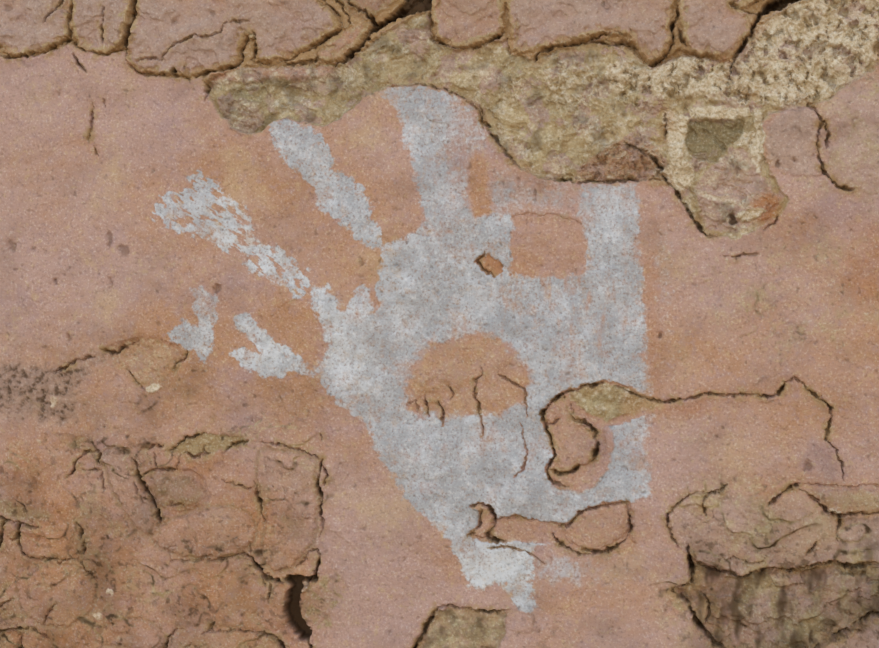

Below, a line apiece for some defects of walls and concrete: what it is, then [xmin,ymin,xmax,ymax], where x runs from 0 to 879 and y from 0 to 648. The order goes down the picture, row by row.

crack [0,0,506,100]
crack [533,6,688,68]
spalling [204,0,879,241]
spalling [109,335,187,393]
crack [0,516,98,582]
crack [66,449,107,494]
crack [132,433,330,602]
spalling [540,379,655,492]
crack [406,368,879,648]
crack [164,622,286,648]
spalling [413,608,510,648]
spalling [675,559,879,648]